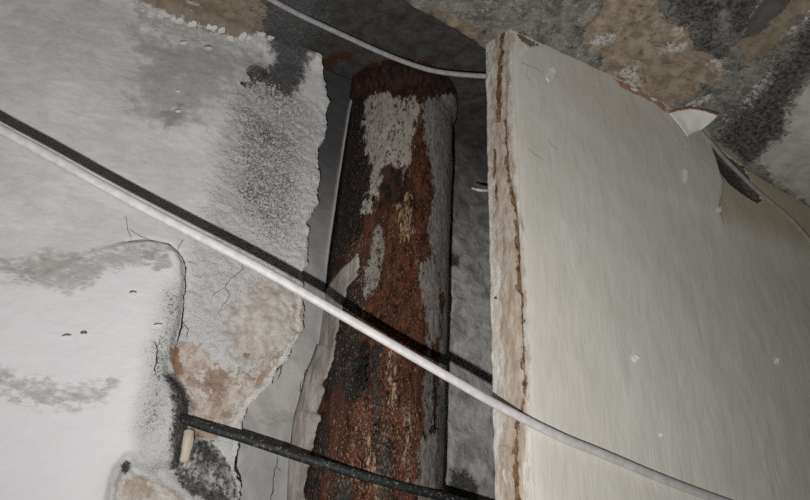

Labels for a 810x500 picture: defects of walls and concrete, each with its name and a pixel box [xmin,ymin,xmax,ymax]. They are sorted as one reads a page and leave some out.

leakage [138,0,337,265]
corrosion [322,51,358,68]
spalling [580,0,729,137]
leakage [669,0,810,162]
crack [125,215,189,373]
crack [211,264,243,316]
spalling [169,218,309,442]
corrosion [332,61,457,500]
corrosion [490,31,530,500]